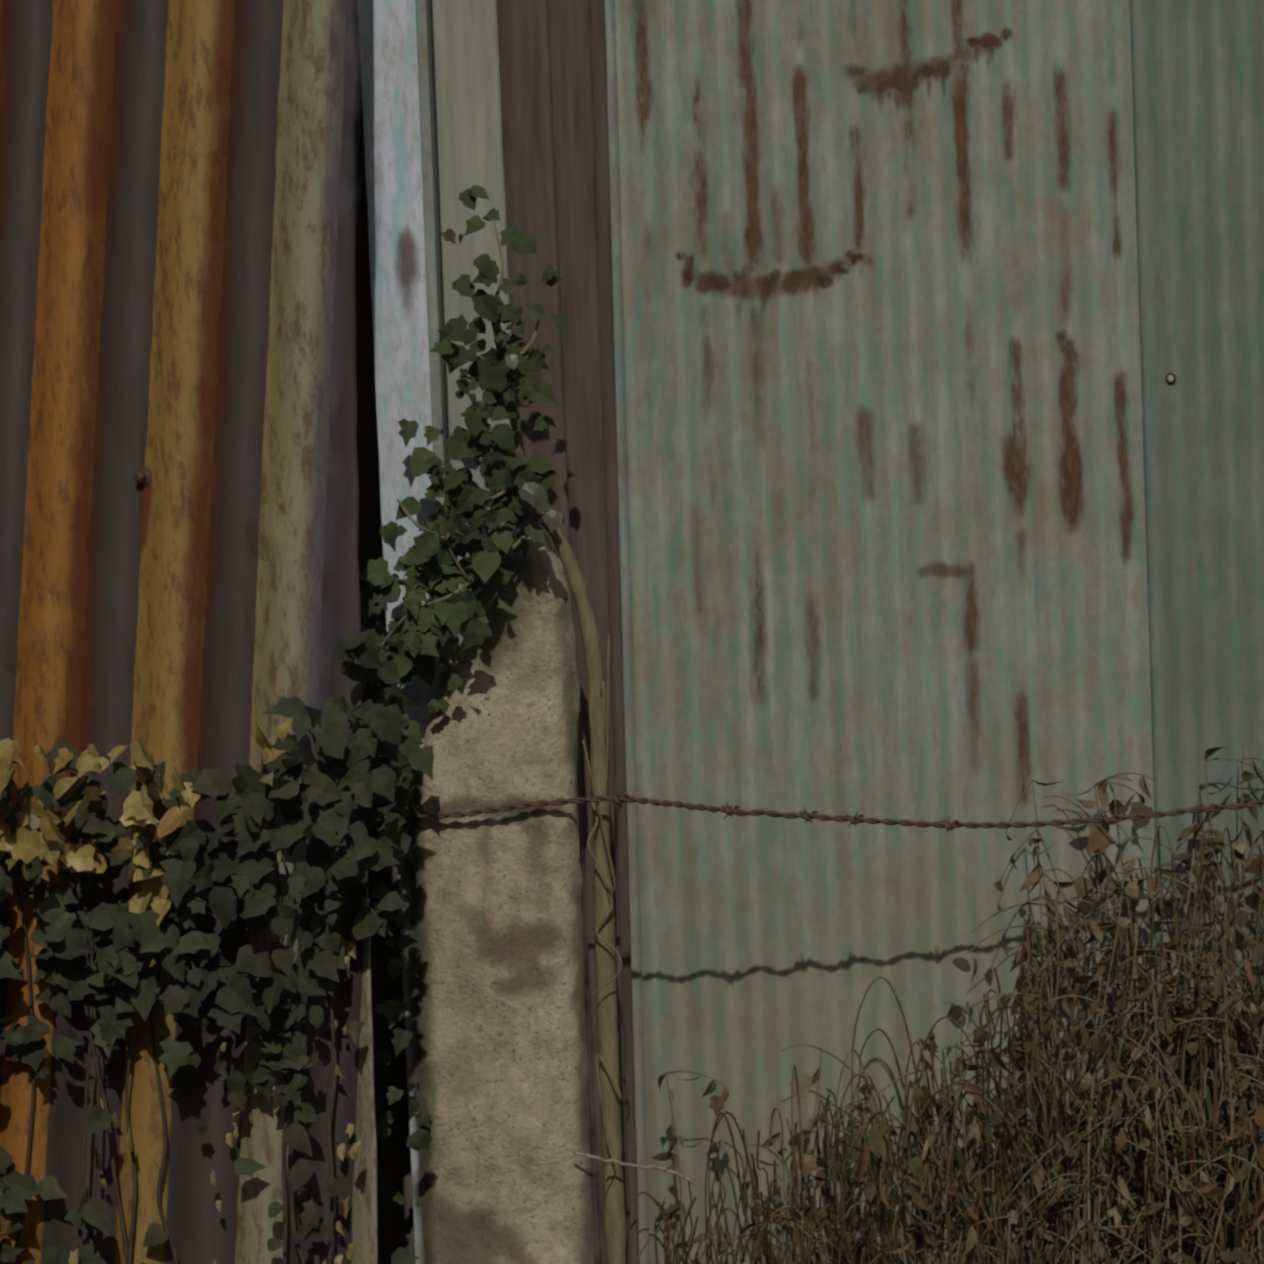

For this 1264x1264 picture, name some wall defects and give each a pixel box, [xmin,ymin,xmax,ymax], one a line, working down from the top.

rust [636,0,650,133]
rust [677,0,863,300]
rust [849,0,1011,254]
rust [1004,95,1013,156]
rust [1055,70,1069,188]
rust [1109,114,1117,196]
rust [1113,217,1121,253]
rust [1004,432,1027,509]
rust [1058,330,1081,526]
rust [1115,376,1133,560]
rust [920,565,978,651]